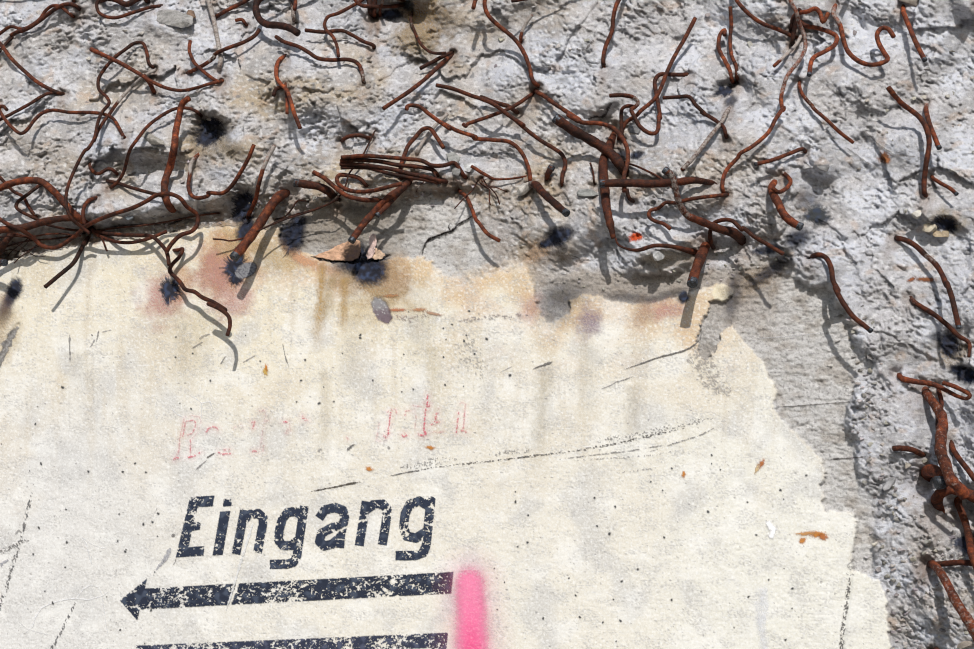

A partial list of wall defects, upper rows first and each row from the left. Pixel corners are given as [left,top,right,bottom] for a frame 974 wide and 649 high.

spalling [0,0,217,197]
spalling [62,0,803,293]
spalling [0,183,67,226]
spalling [0,222,83,261]
leakage [203,233,256,292]
spalling [0,326,19,366]
leakage [151,285,182,312]
spalling [371,297,426,323]
corrosion [385,294,440,316]
spalling [535,0,974,649]